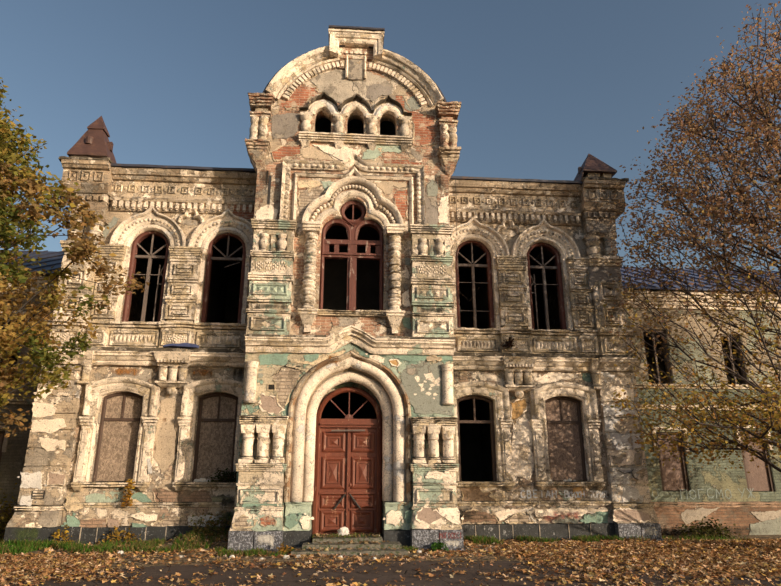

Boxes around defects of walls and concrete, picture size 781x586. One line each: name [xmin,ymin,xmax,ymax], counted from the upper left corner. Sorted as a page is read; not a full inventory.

spalling [258,353,320,415]
peeling [388,355,453,376]
peeling [414,373,441,399]
peeling [31,386,69,454]
peeling [510,398,534,484]
spalling [17,471,314,529]
peeling [383,486,651,528]